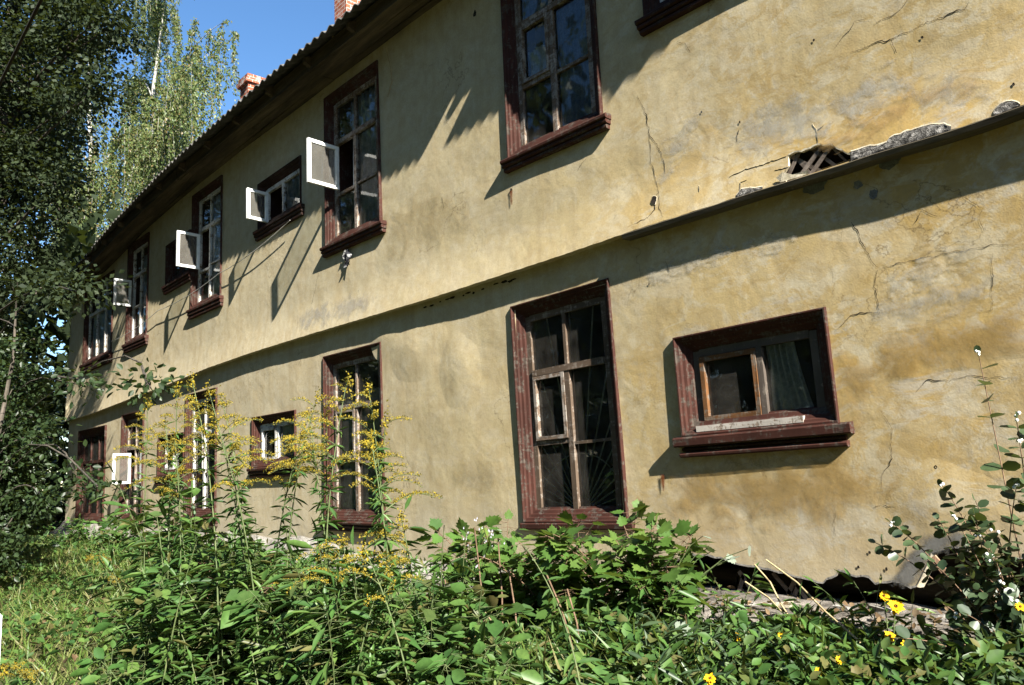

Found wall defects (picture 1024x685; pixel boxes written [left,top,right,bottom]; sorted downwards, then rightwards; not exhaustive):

crack [836,1,967,53]
spalling [994,99,1020,115]
crack [628,96,665,227]
spalling [736,186,763,197]
spalling [776,122,951,199]
crack [841,197,1005,326]
spalling [693,532,968,600]